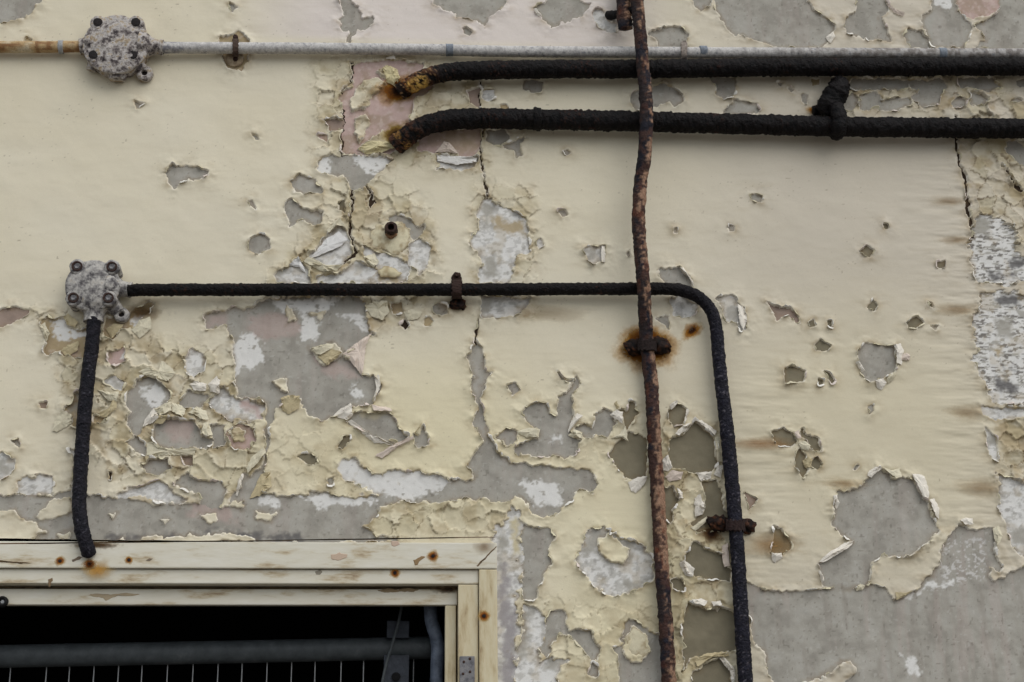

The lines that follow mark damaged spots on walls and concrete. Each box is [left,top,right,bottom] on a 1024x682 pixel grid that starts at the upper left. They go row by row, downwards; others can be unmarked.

crack [339,61,355,157]
rust [380,78,410,102]
crack [479,131,489,199]
crack [954,116,975,247]
peeling [86,55,649,602]
rust [620,328,642,367]
rust [685,324,700,338]
peeling [771,426,823,479]
rust [84,559,107,575]
peeling [662,400,736,682]
peeling [747,464,1024,682]
peeling [613,619,661,682]